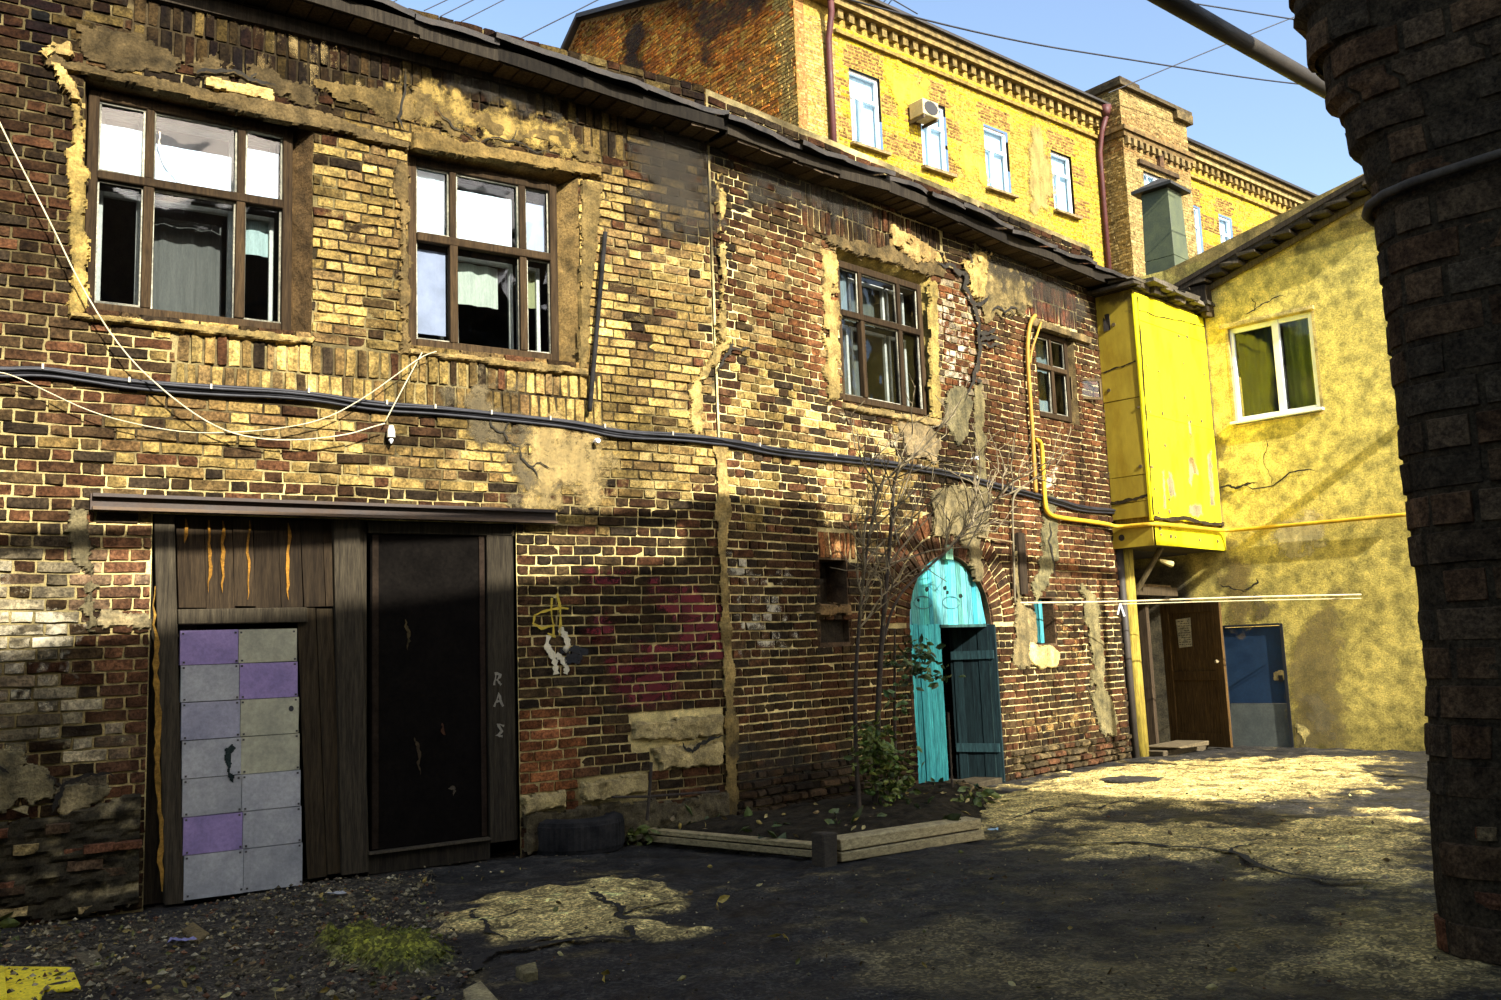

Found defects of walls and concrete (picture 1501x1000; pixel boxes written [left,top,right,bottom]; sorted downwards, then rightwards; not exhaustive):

spalling [38,41,85,108]
spalling [203,76,275,101]
peeling [888,224,1036,323]
peeling [1162,450,1215,517]
crack [1219,440,1315,492]
peeling [1029,642,1060,670]
spalling [0,746,142,922]